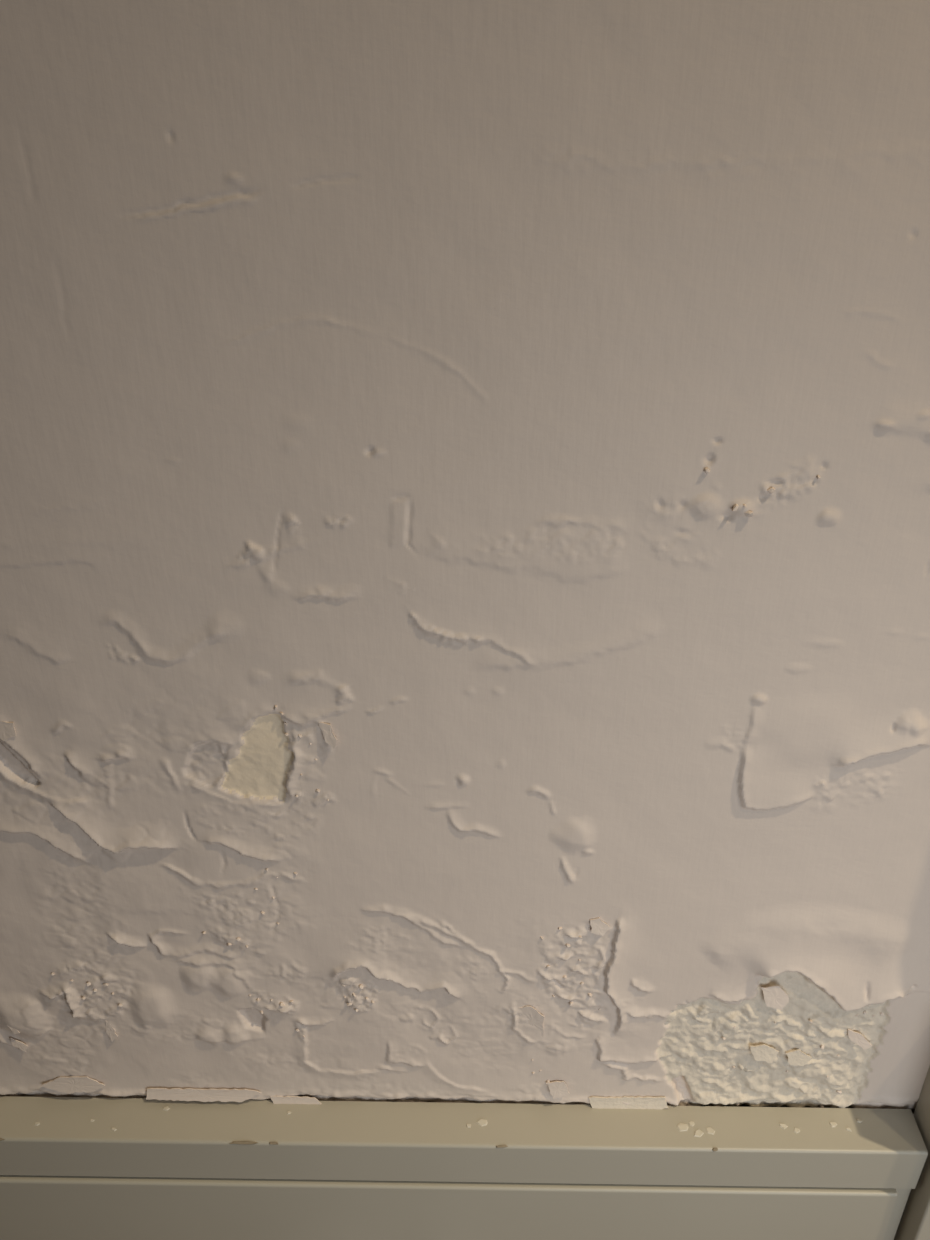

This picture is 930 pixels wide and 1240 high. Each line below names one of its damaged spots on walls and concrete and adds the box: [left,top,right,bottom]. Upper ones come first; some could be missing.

spalling [0,697,615,1083]
spalling [656,941,917,1108]